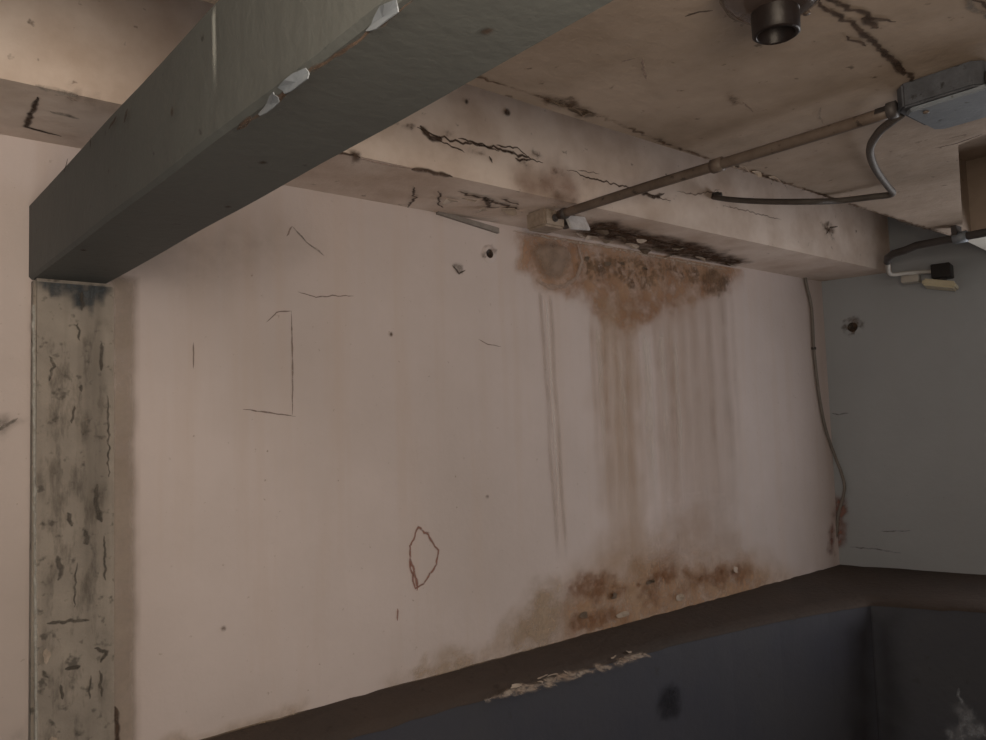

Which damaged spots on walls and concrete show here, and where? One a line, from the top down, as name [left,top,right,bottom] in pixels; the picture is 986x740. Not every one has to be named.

crack [818,0,914,82]
crack [407,125,542,163]
crack [340,152,519,216]
crack [570,170,778,219]
water stain [522,234,734,327]
spalling [516,222,743,289]
spalling [494,651,650,698]